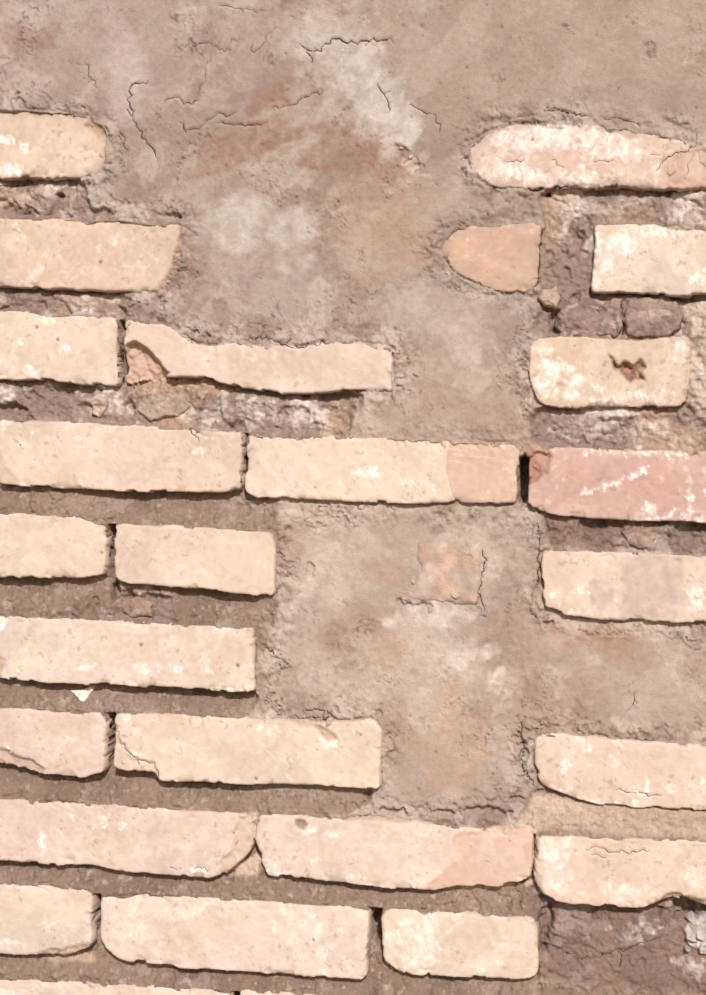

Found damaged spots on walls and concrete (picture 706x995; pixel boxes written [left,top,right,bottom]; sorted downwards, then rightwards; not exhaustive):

crack [165,4,323,133]
crack [299,37,393,62]
crack [119,81,158,160]
crack [378,86,441,132]
spalling [124,337,171,387]
spalling [605,351,649,387]
spalling [522,443,553,486]
spalling [0,746,51,774]
spalling [114,734,162,781]
spalling [216,810,262,879]
spalling [643,891,706,954]
spalling [36,936,100,967]